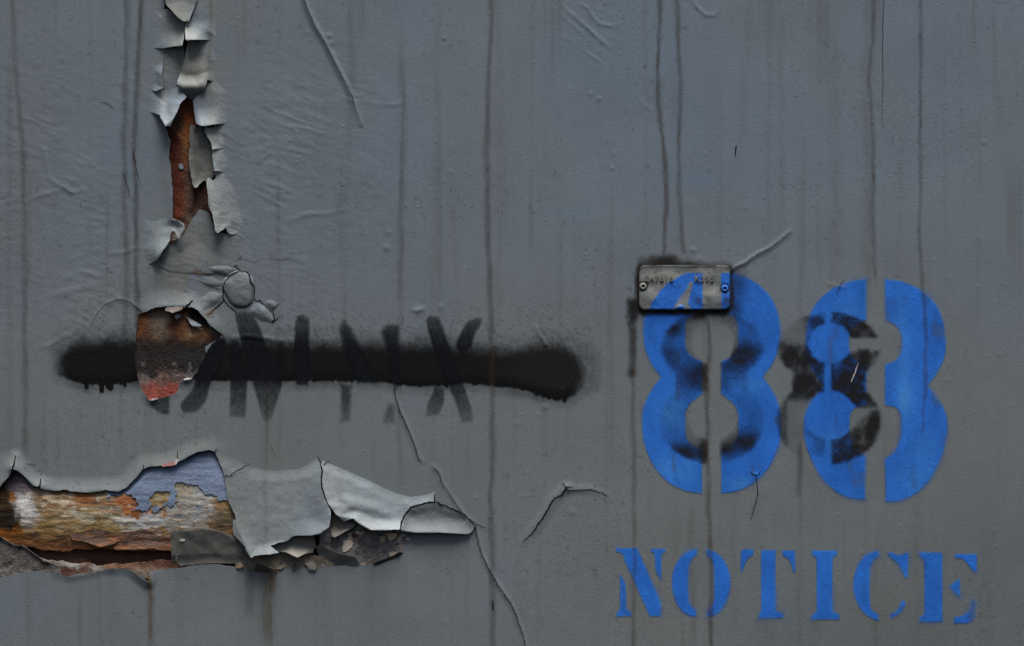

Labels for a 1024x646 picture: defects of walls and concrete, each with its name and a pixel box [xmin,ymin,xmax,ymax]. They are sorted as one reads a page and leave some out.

peeling [142,0,243,275]
rust [91,299,224,401]
rust [0,449,485,600]
crack [394,388,526,646]
crack [523,483,608,542]